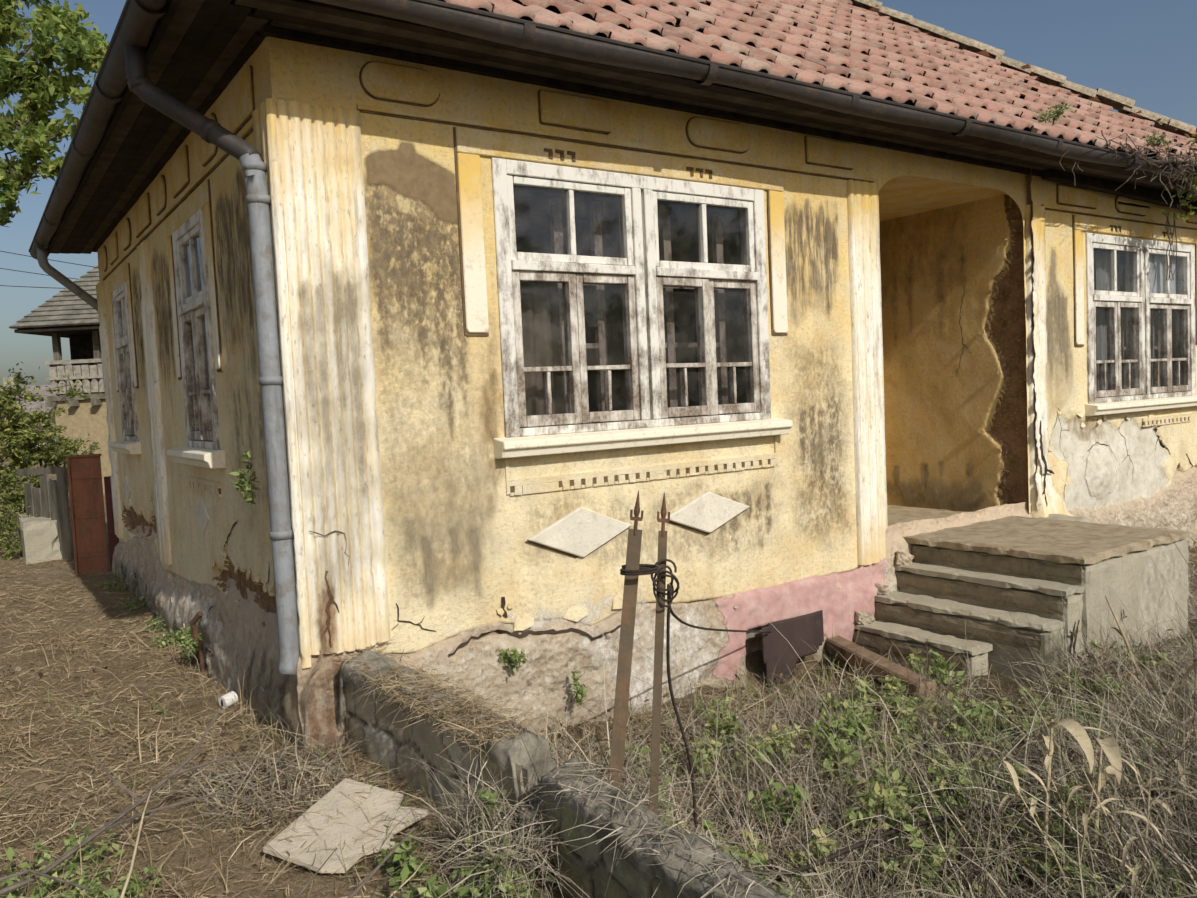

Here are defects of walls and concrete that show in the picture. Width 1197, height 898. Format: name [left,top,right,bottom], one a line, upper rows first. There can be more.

leakage [132,256,173,372]
leakage [215,173,253,336]
leakage [337,286,364,464]
leakage [365,142,465,425]
leakage [784,201,837,309]
spalling [977,168,1197,511]
spalling [121,499,157,541]
leakage [800,398,842,525]
spalling [169,543,276,631]
crack [309,530,350,648]
crack [392,603,436,632]